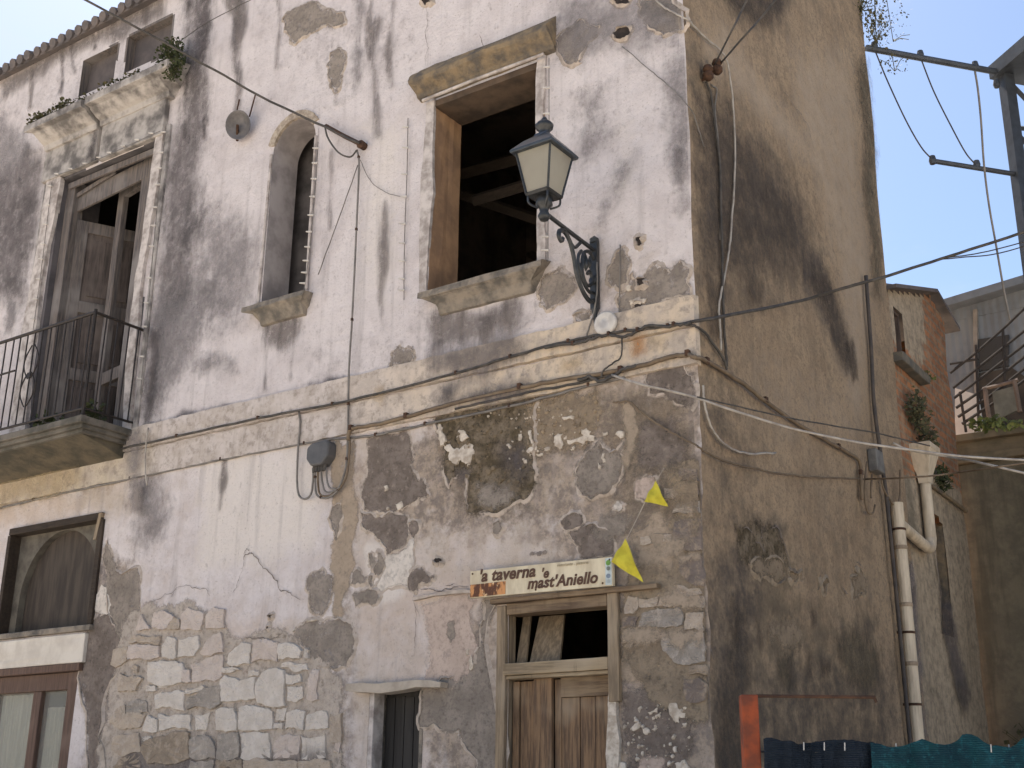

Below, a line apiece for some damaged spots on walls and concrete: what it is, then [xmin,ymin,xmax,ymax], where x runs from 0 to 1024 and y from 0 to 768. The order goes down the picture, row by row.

peeling [281,1,348,47]
peeling [556,0,691,69]
peeling [326,47,348,94]
leakage [0,119,38,330]
peeling [536,265,592,323]
peeling [605,233,693,312]
crack [143,548,298,604]
flaking render [77,426,510,768]
flaking render [432,389,709,768]
spalling [735,520,803,587]